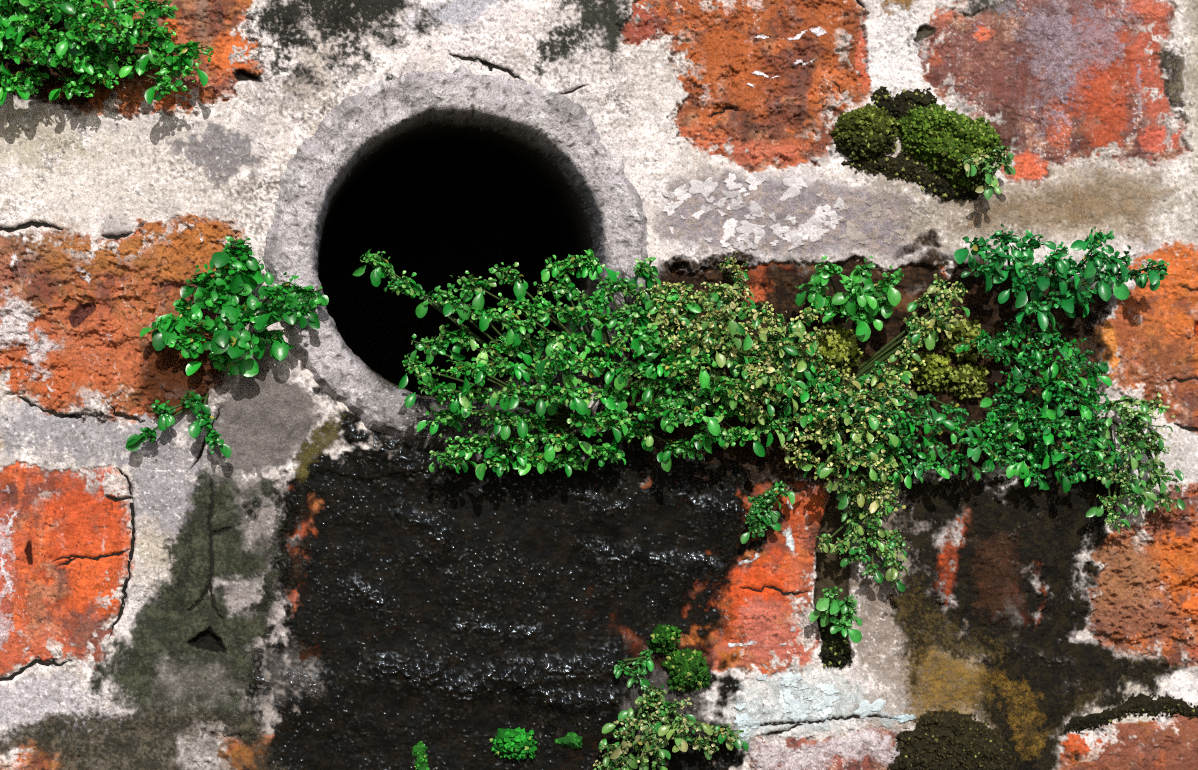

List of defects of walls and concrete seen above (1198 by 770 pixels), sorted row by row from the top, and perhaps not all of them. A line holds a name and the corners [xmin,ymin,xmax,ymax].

damp [249,0,442,91]
damp [535,0,641,75]
spalling [915,25,936,42]
damp [122,344,900,770]
damp [879,458,1187,770]
damp [91,639,131,693]